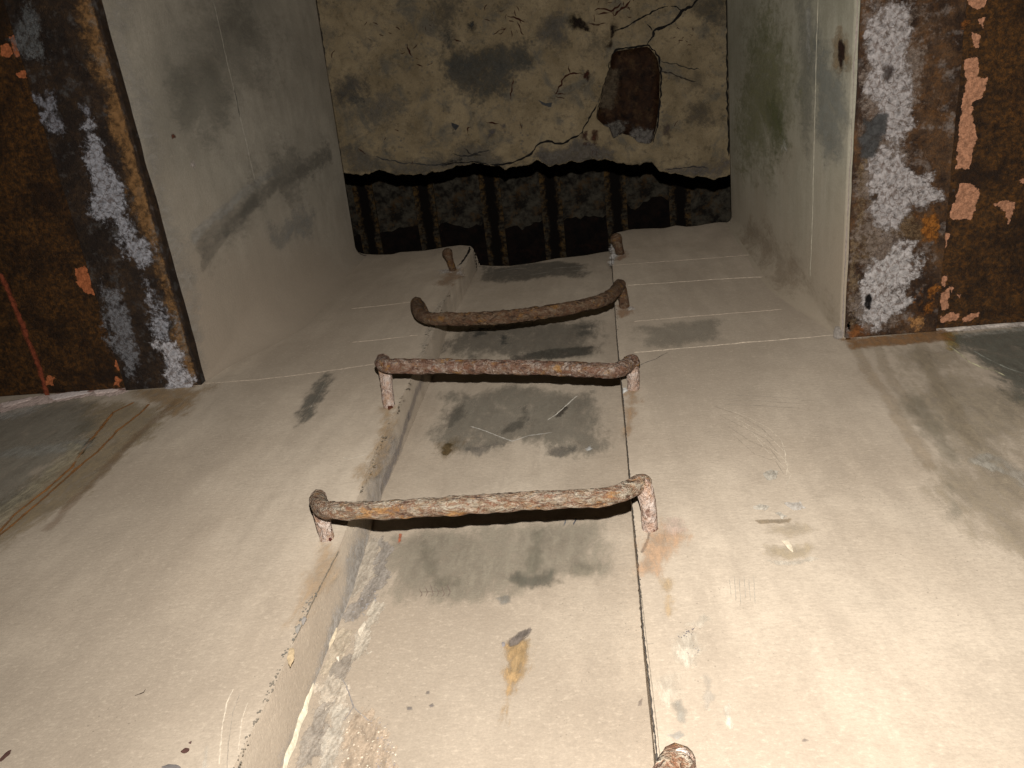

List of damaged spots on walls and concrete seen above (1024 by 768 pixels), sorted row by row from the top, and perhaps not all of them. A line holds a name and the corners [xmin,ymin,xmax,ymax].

crack [445,0,699,166]
spalling [595,25,669,147]
crack [723,0,731,155]
peeling [955,0,988,170]
peeling [950,183,980,220]
peeling [993,200,1015,224]
peeling [936,276,1024,332]
leakage [301,375,327,420]